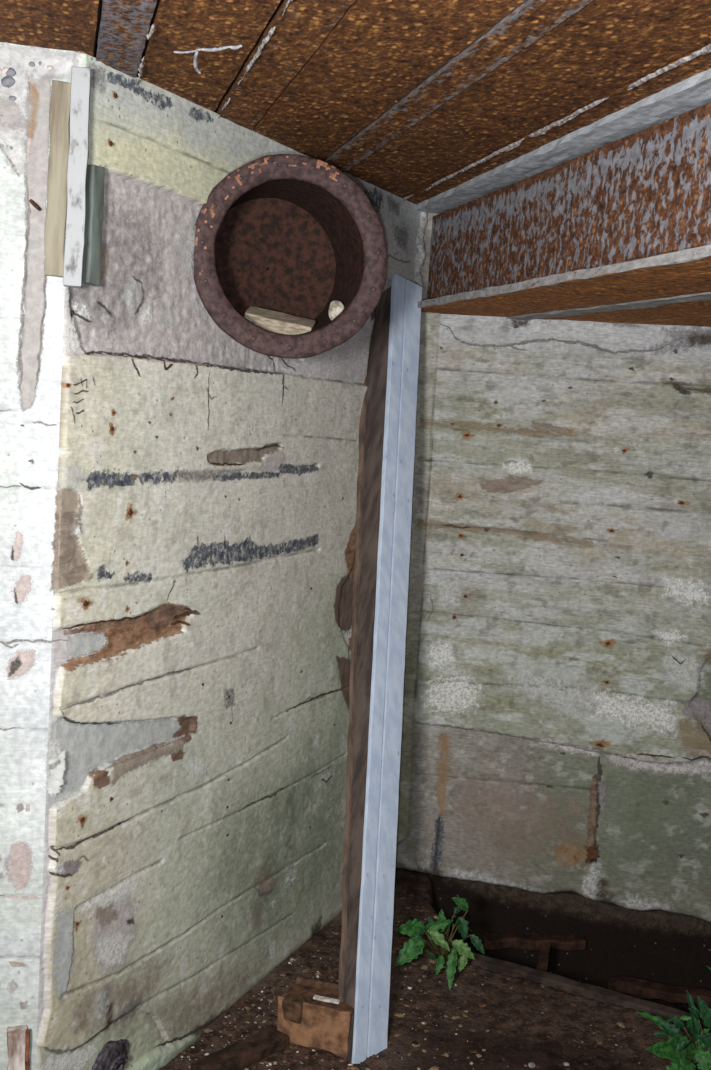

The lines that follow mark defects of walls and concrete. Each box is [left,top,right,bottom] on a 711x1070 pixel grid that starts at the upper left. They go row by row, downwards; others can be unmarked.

rust [225,156,339,200]
rust [195,205,215,249]
crack [440,323,670,354]
spalling [207,443,286,475]
spalling [50,467,93,590]
peeling [661,577,711,608]
spalling [61,603,200,671]
peeling [419,629,711,776]
spalling [43,715,205,802]